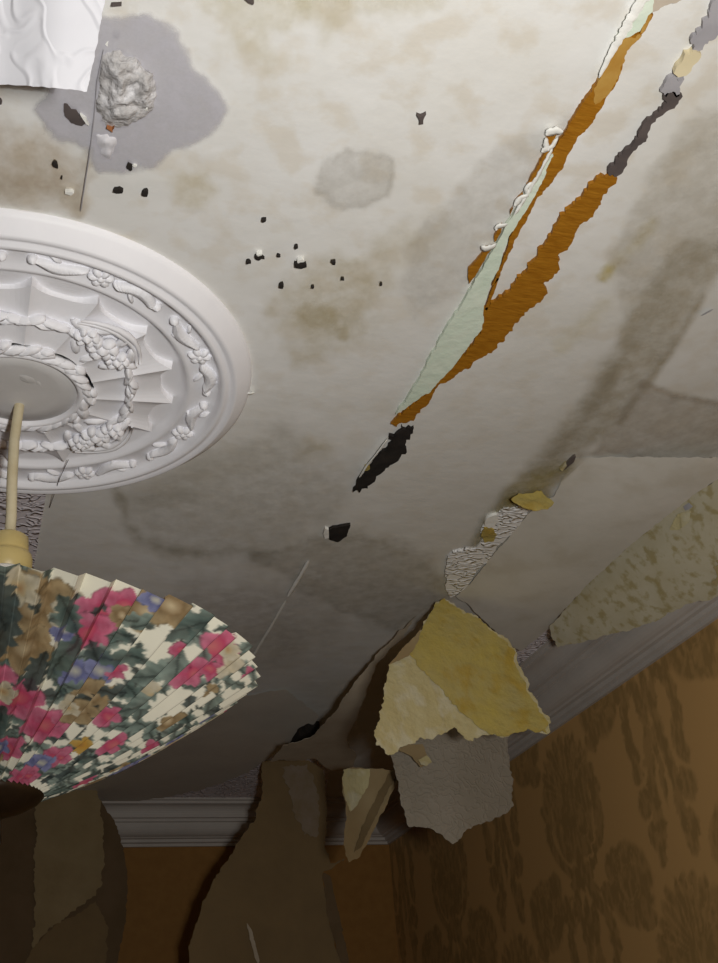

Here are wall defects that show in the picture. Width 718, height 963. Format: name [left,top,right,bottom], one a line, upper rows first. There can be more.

spalling [64,41,157,159]
peeling [52,159,74,196]
peeling [246,250,265,265]
peeling [294,243,307,269]